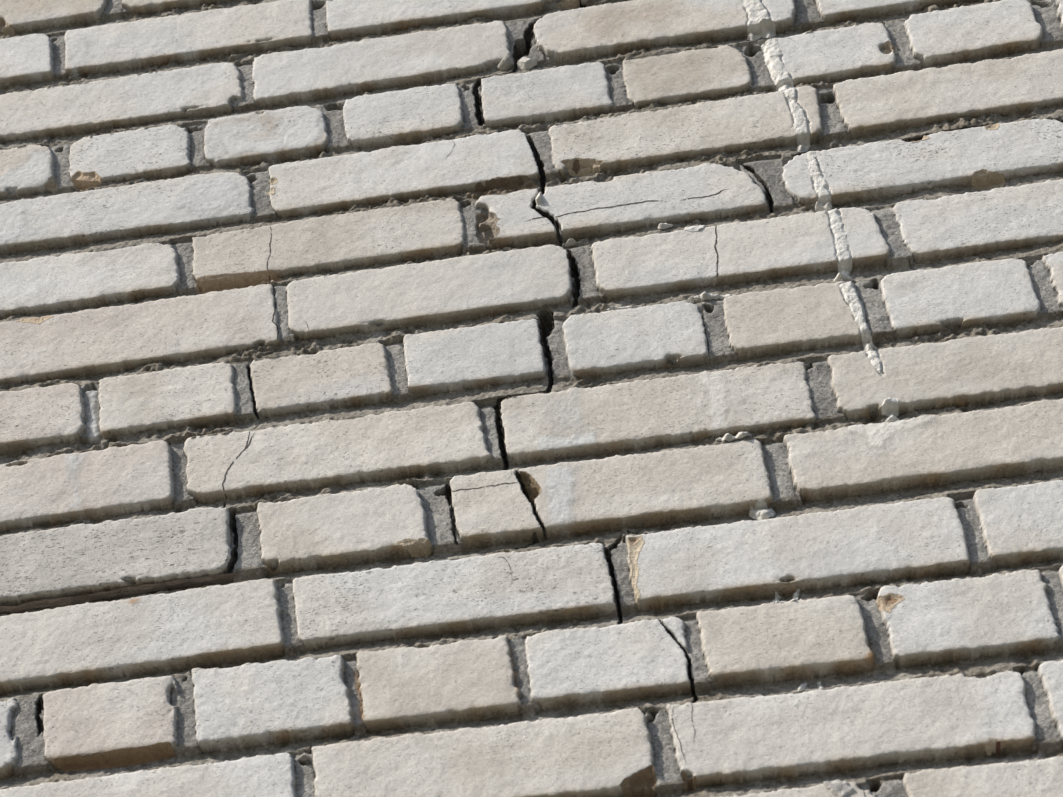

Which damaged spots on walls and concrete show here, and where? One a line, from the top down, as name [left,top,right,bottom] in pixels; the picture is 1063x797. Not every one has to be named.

crack [473,20,538,126]
crack [743,165,773,213]
damp [743,0,884,376]
crack [445,136,725,576]
spalling [519,471,541,514]
crack [604,532,647,625]
crack [659,620,698,762]
spalling [620,765,657,797]